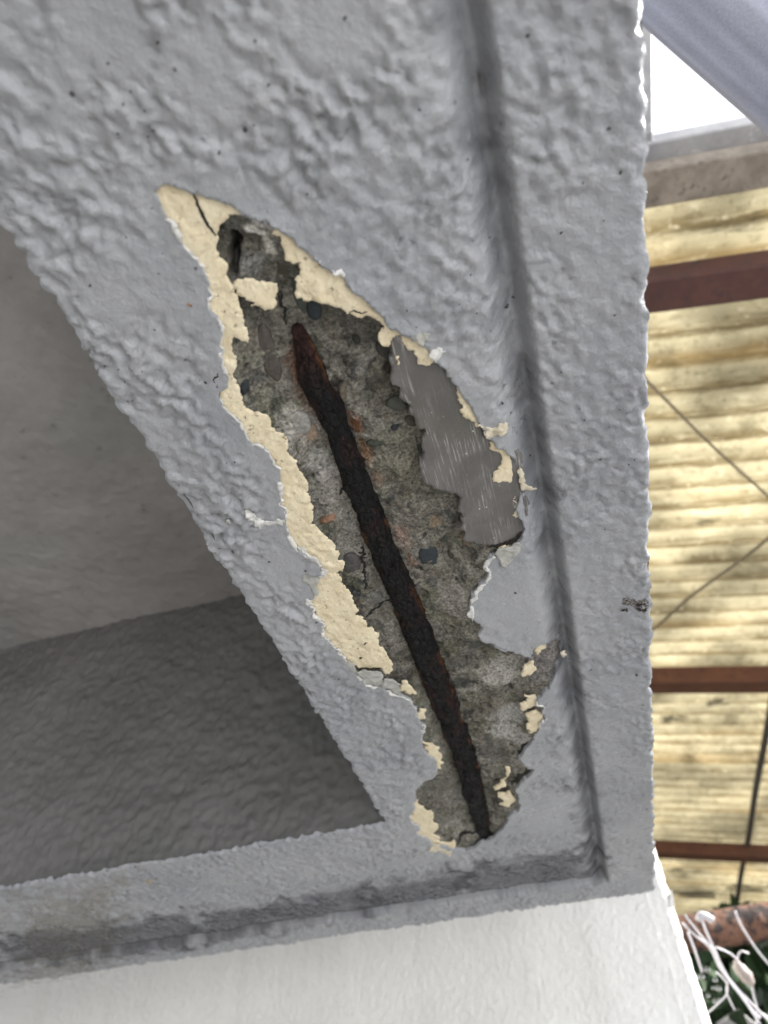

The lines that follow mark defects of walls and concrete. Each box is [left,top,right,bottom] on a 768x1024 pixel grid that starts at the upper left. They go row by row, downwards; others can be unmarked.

spalling [157,185,567,857]